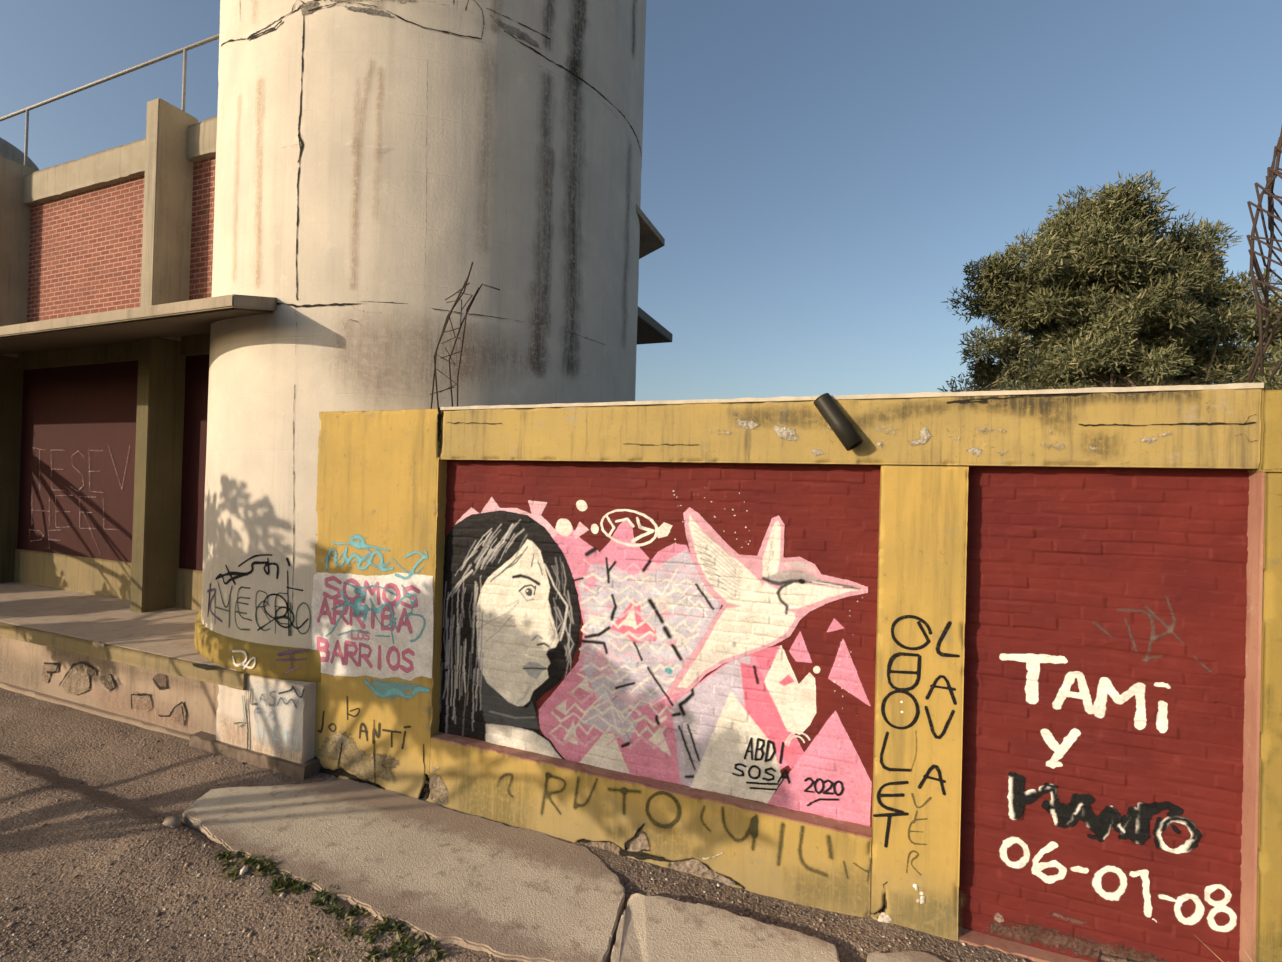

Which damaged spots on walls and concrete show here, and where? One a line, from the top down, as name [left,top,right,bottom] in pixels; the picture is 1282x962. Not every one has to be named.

crack [221,0,642,345]
damp [568,0,582,371]
peeling [710,419,799,441]
peeling [876,427,931,447]
peeling [131,691,186,727]
spalling [317,732,399,782]
crack [577,823,745,889]